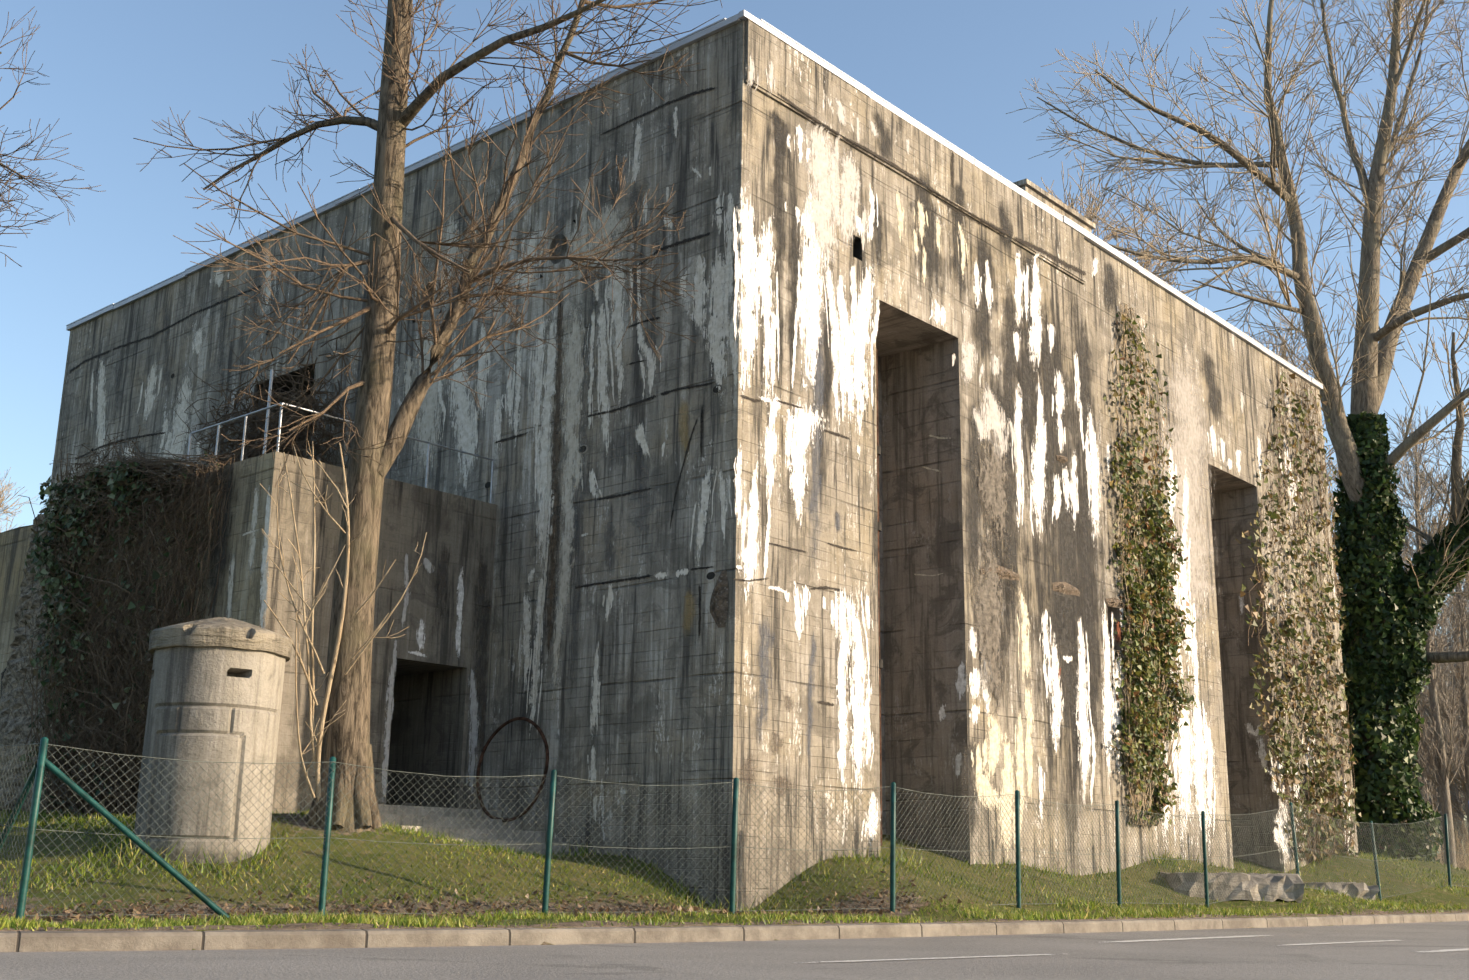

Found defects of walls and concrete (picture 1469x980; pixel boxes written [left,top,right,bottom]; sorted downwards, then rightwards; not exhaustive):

damp [192,245,277,367]
damp [90,357,121,466]
damp [124,313,202,474]
damp [655,56,1124,860]
spalling [1052,582,1080,597]